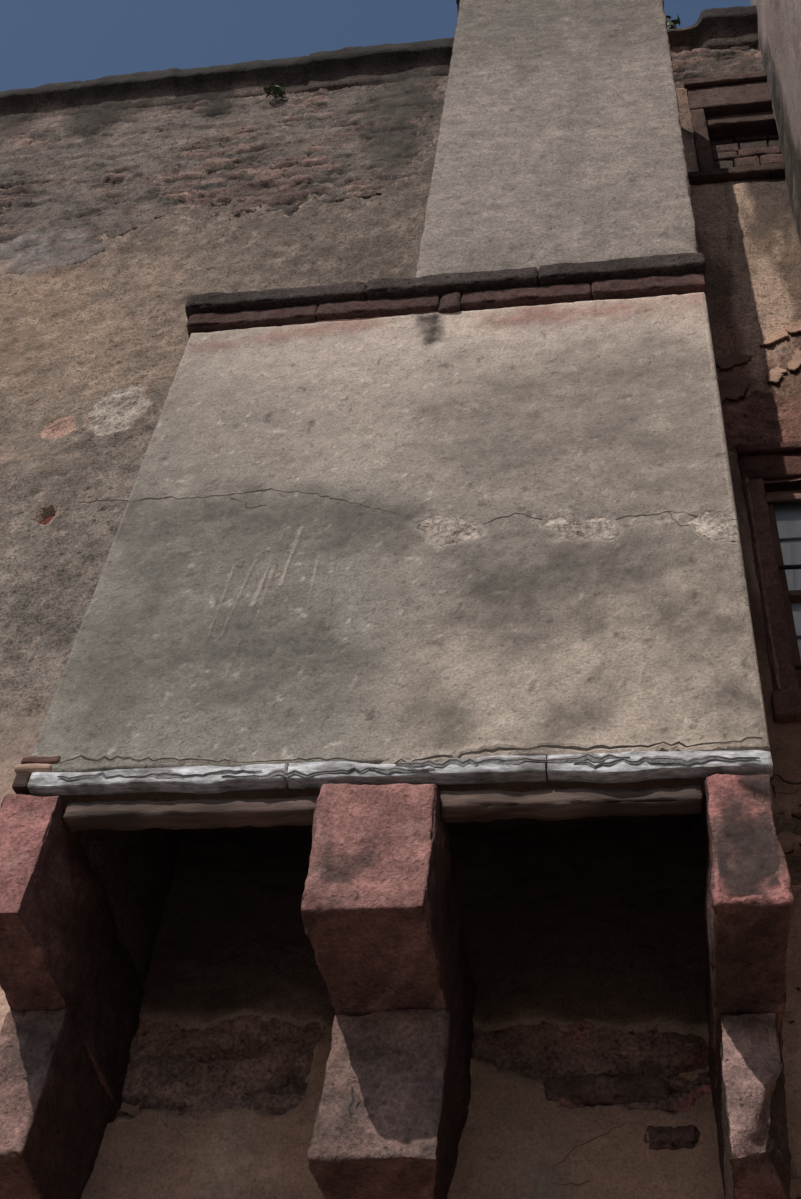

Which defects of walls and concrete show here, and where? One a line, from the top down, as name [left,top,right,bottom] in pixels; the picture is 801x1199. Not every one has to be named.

flaking render [715,320,801,454]
crack [79,488,404,516]
crack [790,1163,801,1199]